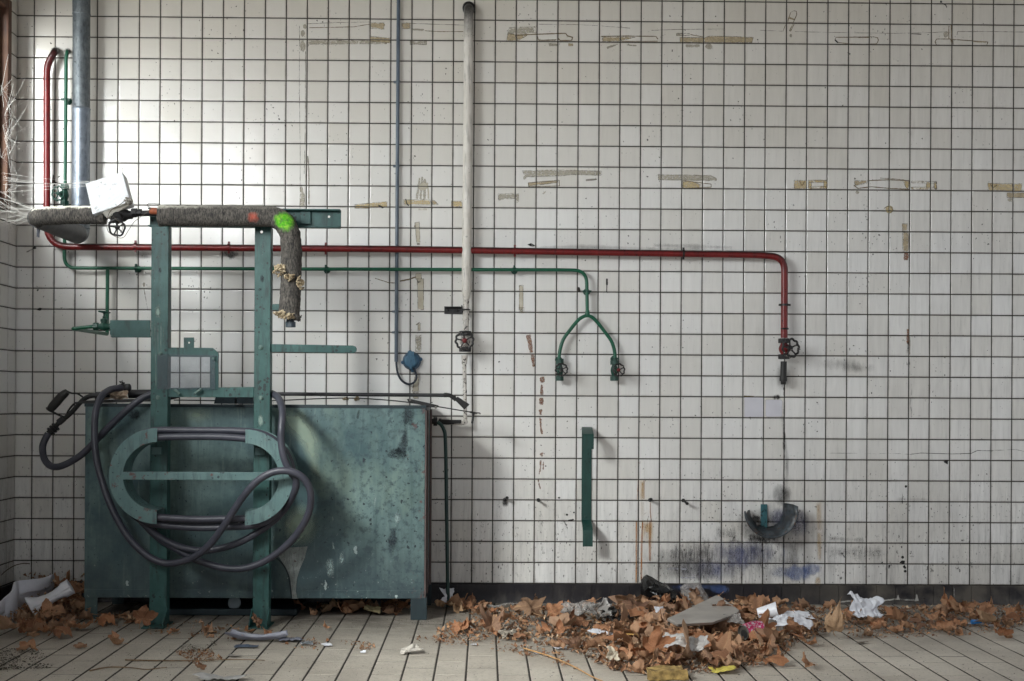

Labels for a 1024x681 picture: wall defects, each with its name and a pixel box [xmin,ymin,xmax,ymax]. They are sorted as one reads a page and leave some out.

rust [526,335,545,434]
rust [636,503,652,579]